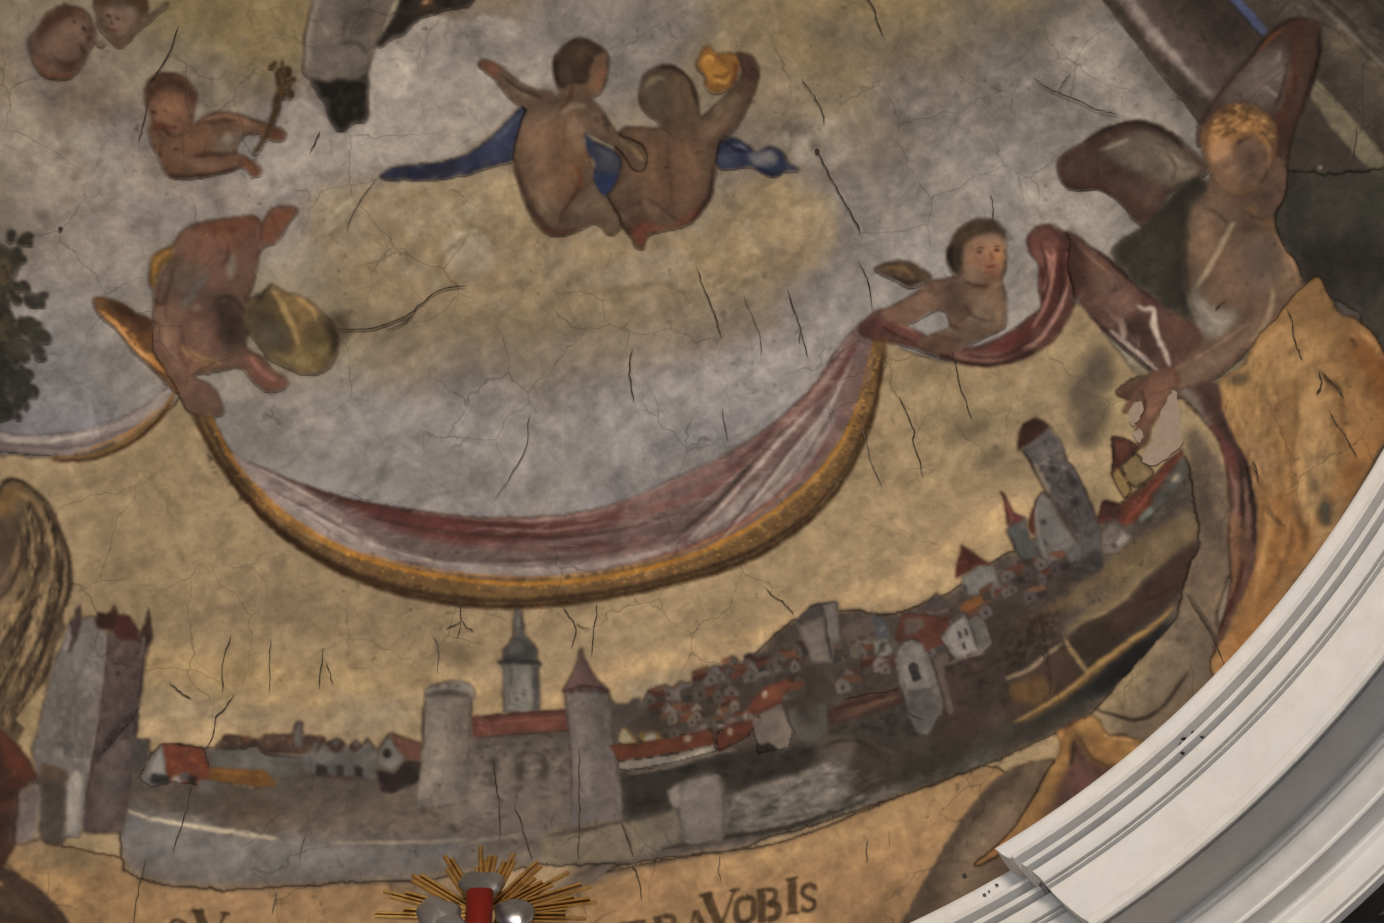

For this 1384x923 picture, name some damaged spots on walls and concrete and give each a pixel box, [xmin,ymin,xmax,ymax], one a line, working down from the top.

crack [868,0,883,35]
crack [1034,74,1118,115]
crack [802,79,872,306]
crack [696,267,762,351]
crack [788,291,808,357]
crack [169,635,235,745]
crack [266,638,274,692]
crack [134,782,192,921]